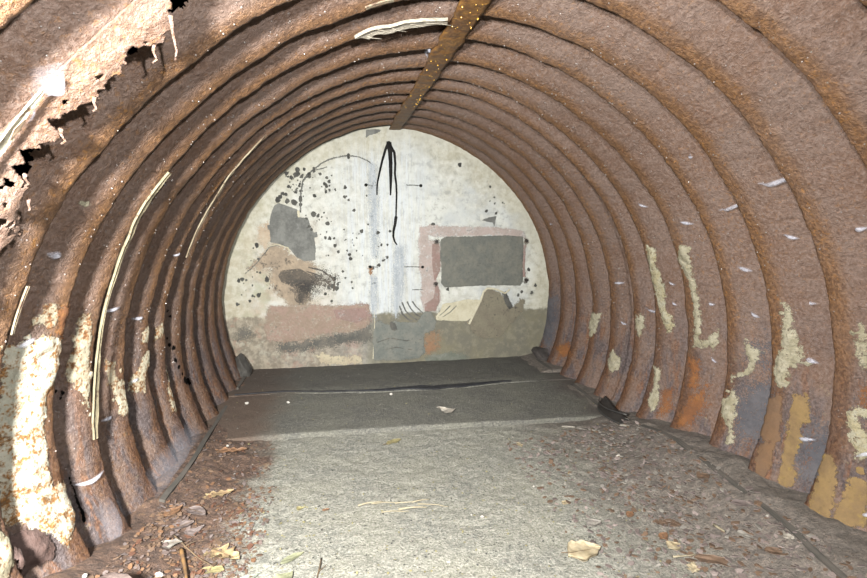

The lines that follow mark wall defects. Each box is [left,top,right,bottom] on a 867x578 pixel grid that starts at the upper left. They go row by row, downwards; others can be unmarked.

peeling [168,14,178,61]
peeling [0,75,56,157]
peeling [0,171,171,578]
corrosion [654,355,716,429]